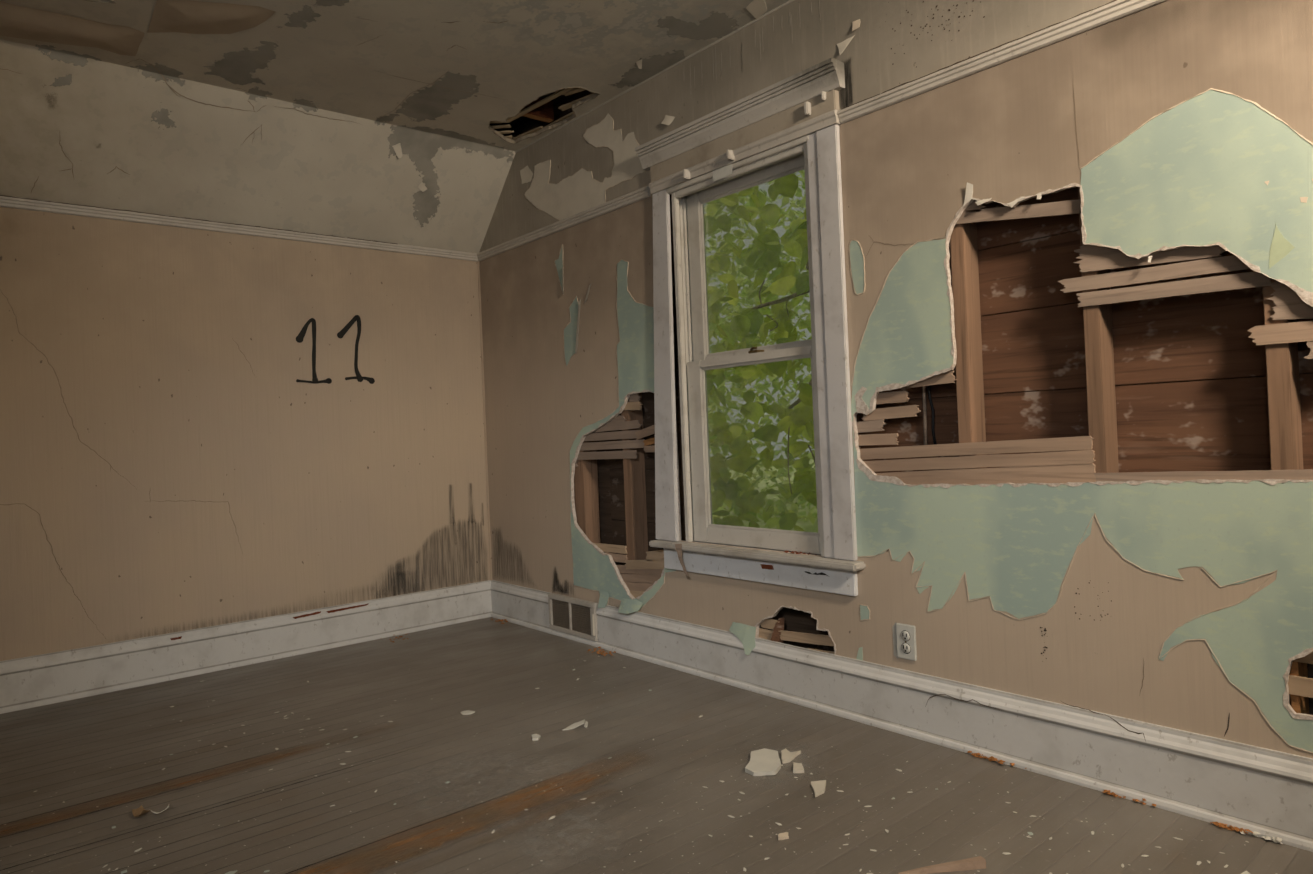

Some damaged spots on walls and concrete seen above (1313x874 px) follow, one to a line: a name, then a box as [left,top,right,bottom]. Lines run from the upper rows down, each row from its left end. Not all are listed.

peeling [375,72,646,227]
spalling [569,259,688,612]
spalling [849,88,1313,753]
spalling [755,605,836,655]